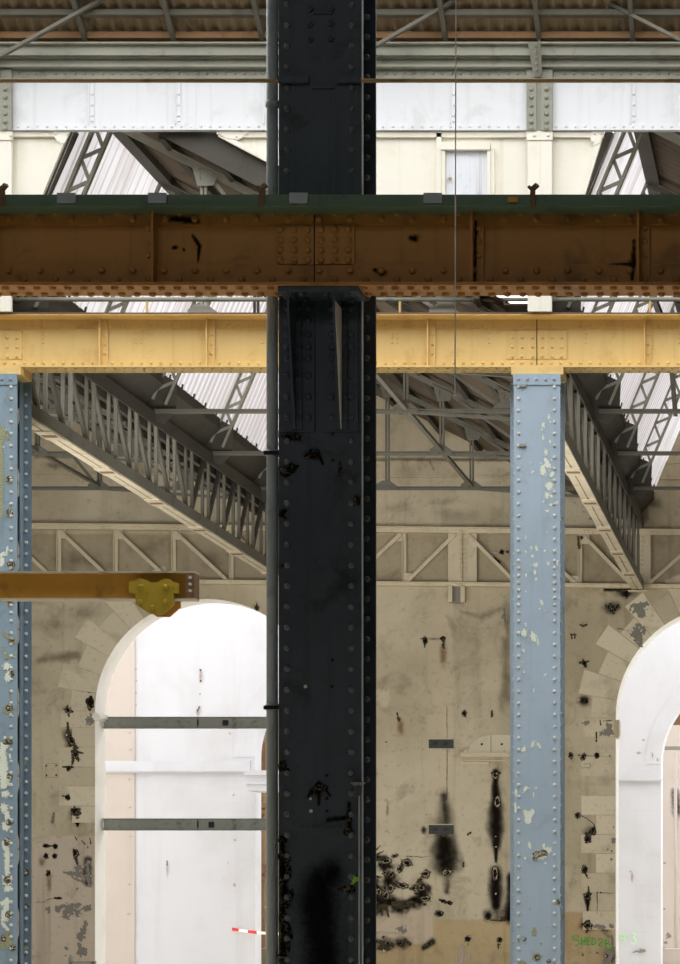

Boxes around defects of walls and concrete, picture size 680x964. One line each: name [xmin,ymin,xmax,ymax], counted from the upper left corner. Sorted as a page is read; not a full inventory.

peeling [529,414,559,512]
peeling [604,588,649,648]
peeling [1,631,16,716]
peeling [520,623,539,674]
peeling [0,736,29,951]
peeling [63,849,92,890]
peeling [25,897,92,957]